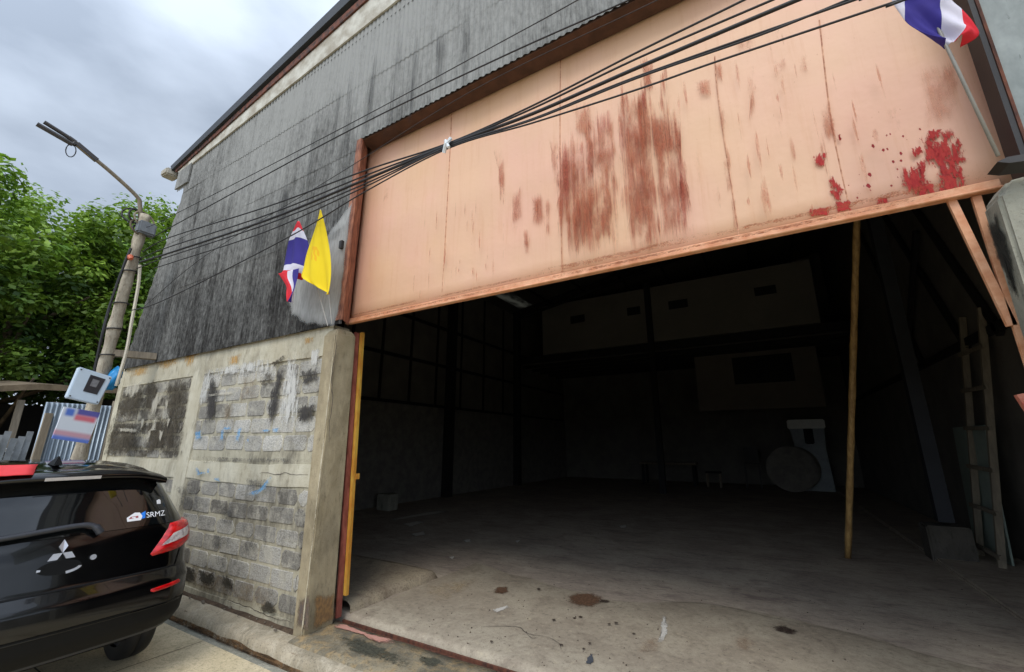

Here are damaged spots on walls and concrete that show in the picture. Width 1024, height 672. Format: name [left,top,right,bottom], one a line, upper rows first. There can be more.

rust [535,61,965,278]
peeling [809,177,858,216]
peeling [859,128,968,204]
damp [104,350,319,456]
damp [186,567,275,613]